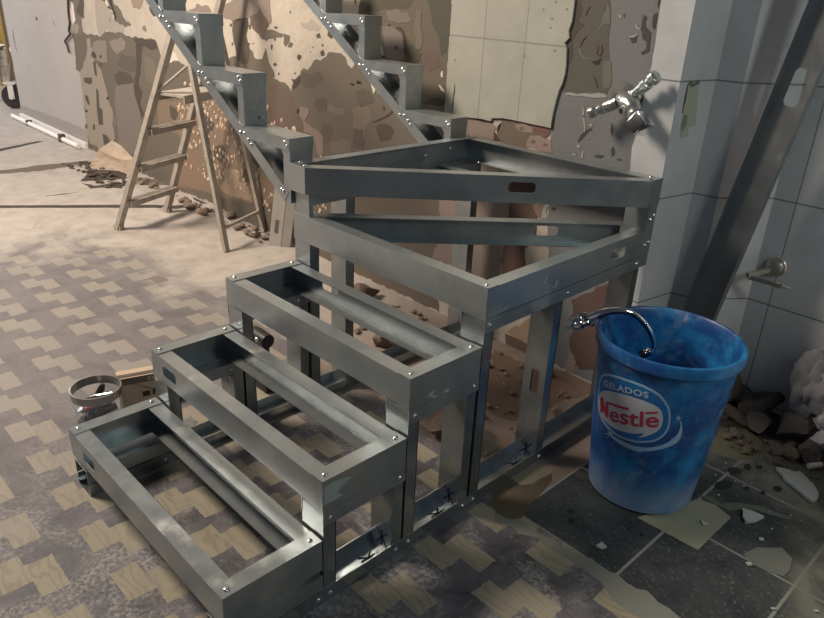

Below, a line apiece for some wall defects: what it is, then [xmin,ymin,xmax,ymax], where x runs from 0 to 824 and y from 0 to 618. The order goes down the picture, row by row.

spalling [354,0,449,112]
peeling [561,0,611,94]
spalling [630,0,660,54]
spalling [229,17,418,158]
spalling [70,0,279,234]
spalling [355,197,456,217]
peeling [476,201,556,235]
spalling [354,264,439,312]
spalling [393,243,453,264]
peeling [471,245,527,280]